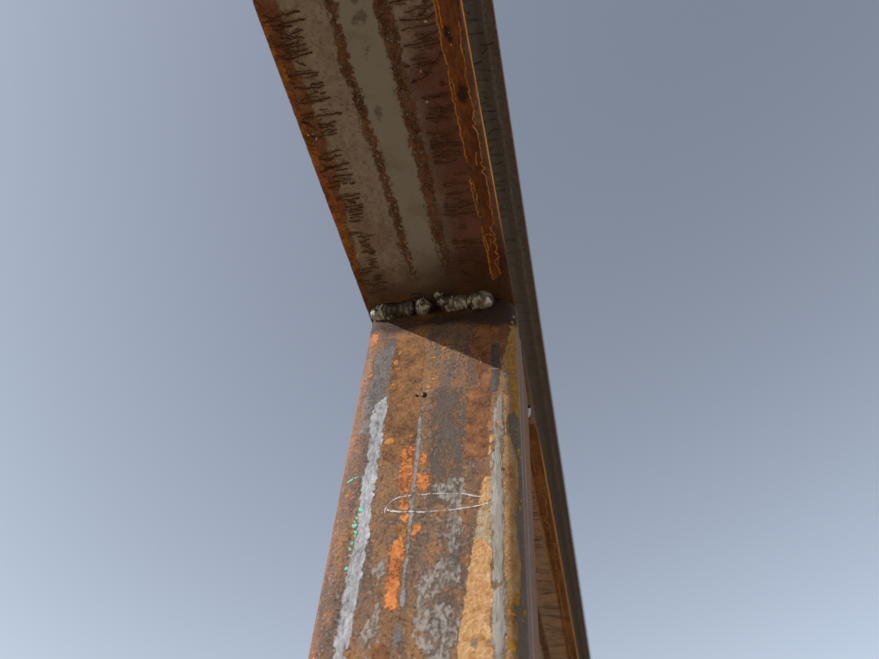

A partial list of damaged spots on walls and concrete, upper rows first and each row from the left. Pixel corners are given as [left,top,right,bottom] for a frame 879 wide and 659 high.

corrosion [253,0,368,308]
corrosion [323,0,418,283]
corrosion [371,0,510,280]
corrosion [382,335,450,610]
peeling [490,343,501,392]
corrosion [457,315,578,659]